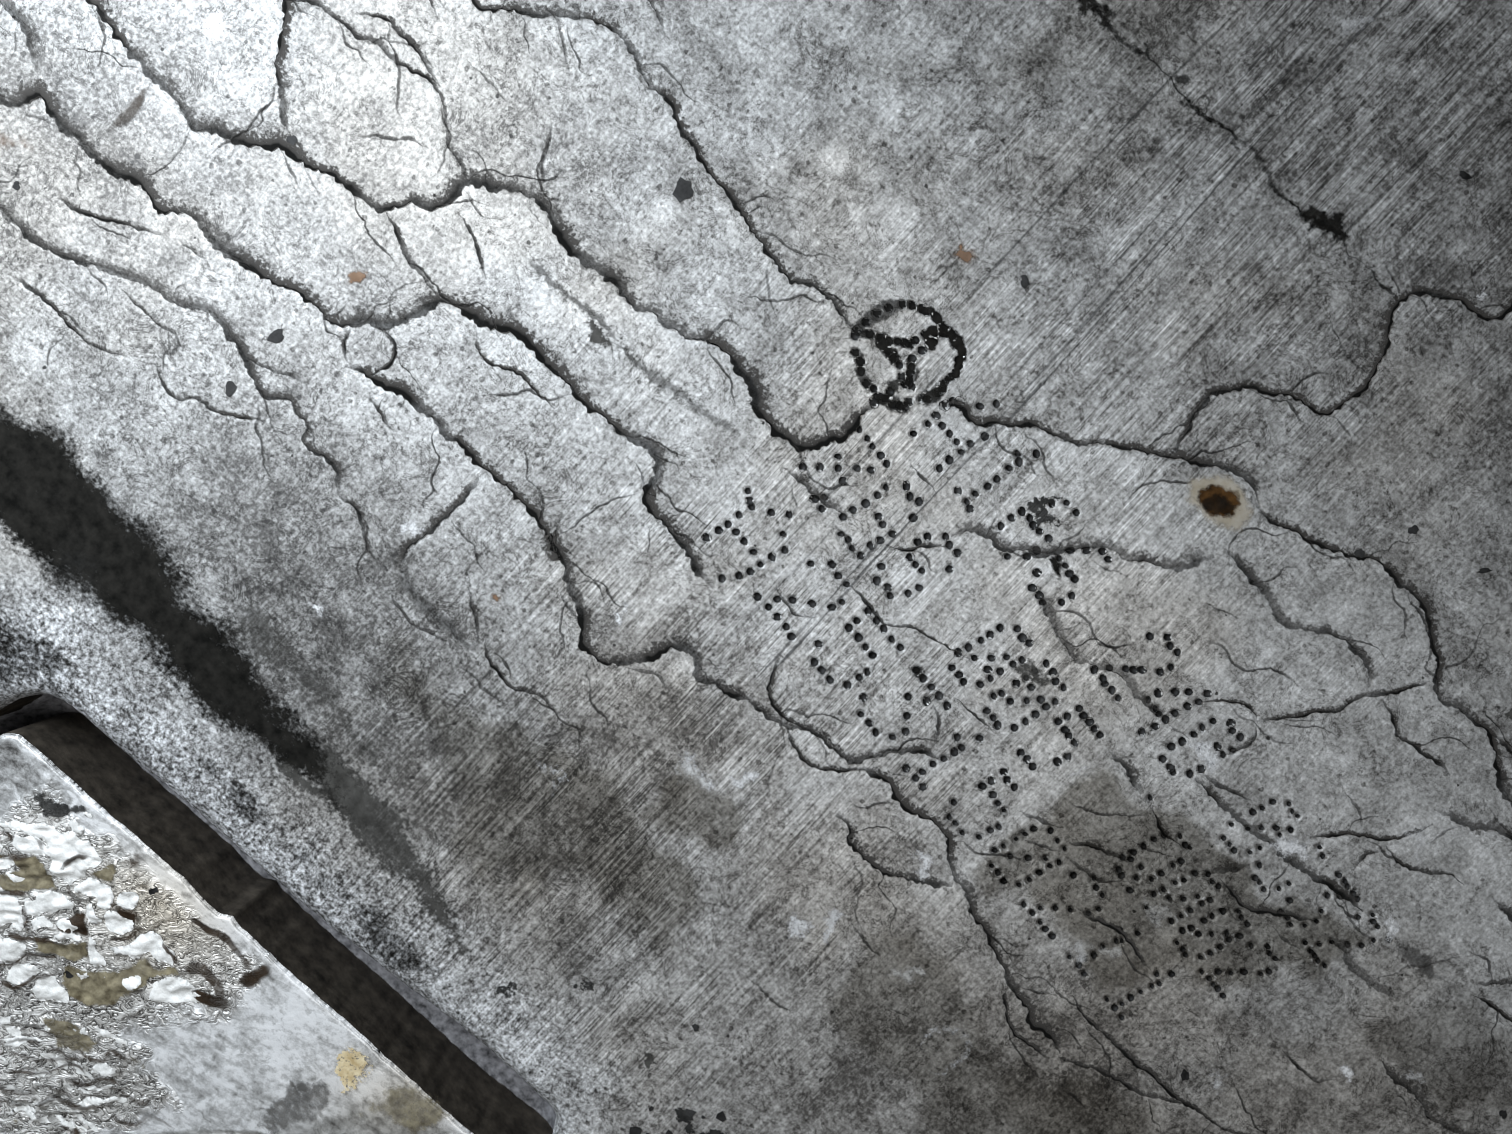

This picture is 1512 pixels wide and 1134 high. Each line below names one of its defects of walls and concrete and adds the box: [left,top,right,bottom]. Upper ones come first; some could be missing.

crack [0,0,1077,1067]
corrosion [1190,476,1251,529]
damp [0,619,72,689]
crack [892,280,1512,975]
damp [33,793,84,818]
damp [206,760,269,825]
damp [276,746,472,957]
peeling [0,812,200,1132]
damp [343,893,439,972]
crack [1478,956,1512,1032]
crack [1065,999,1266,1134]
peeling [629,1108,727,1134]